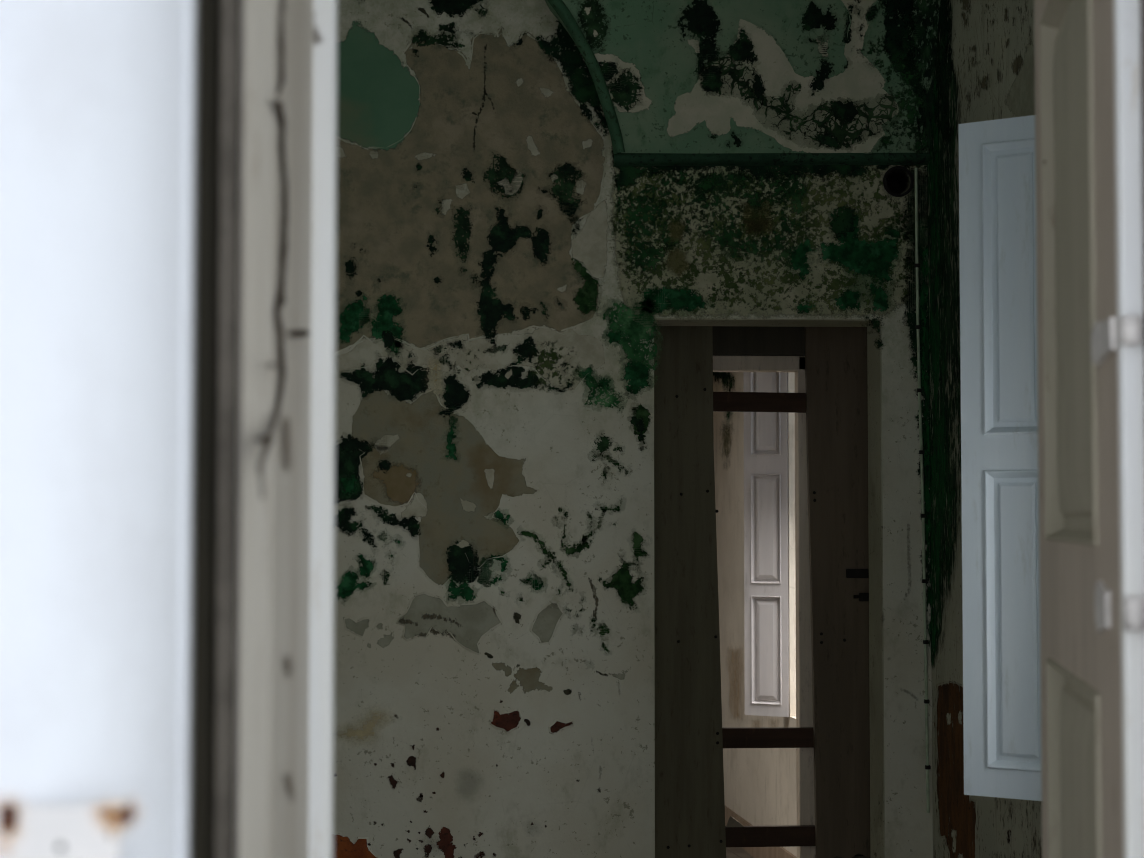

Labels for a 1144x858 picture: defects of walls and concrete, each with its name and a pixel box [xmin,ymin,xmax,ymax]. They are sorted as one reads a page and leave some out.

spalling [336,0,927,392]
damp [335,0,962,667]
spalling [343,388,581,735]
peeling [374,745,416,789]